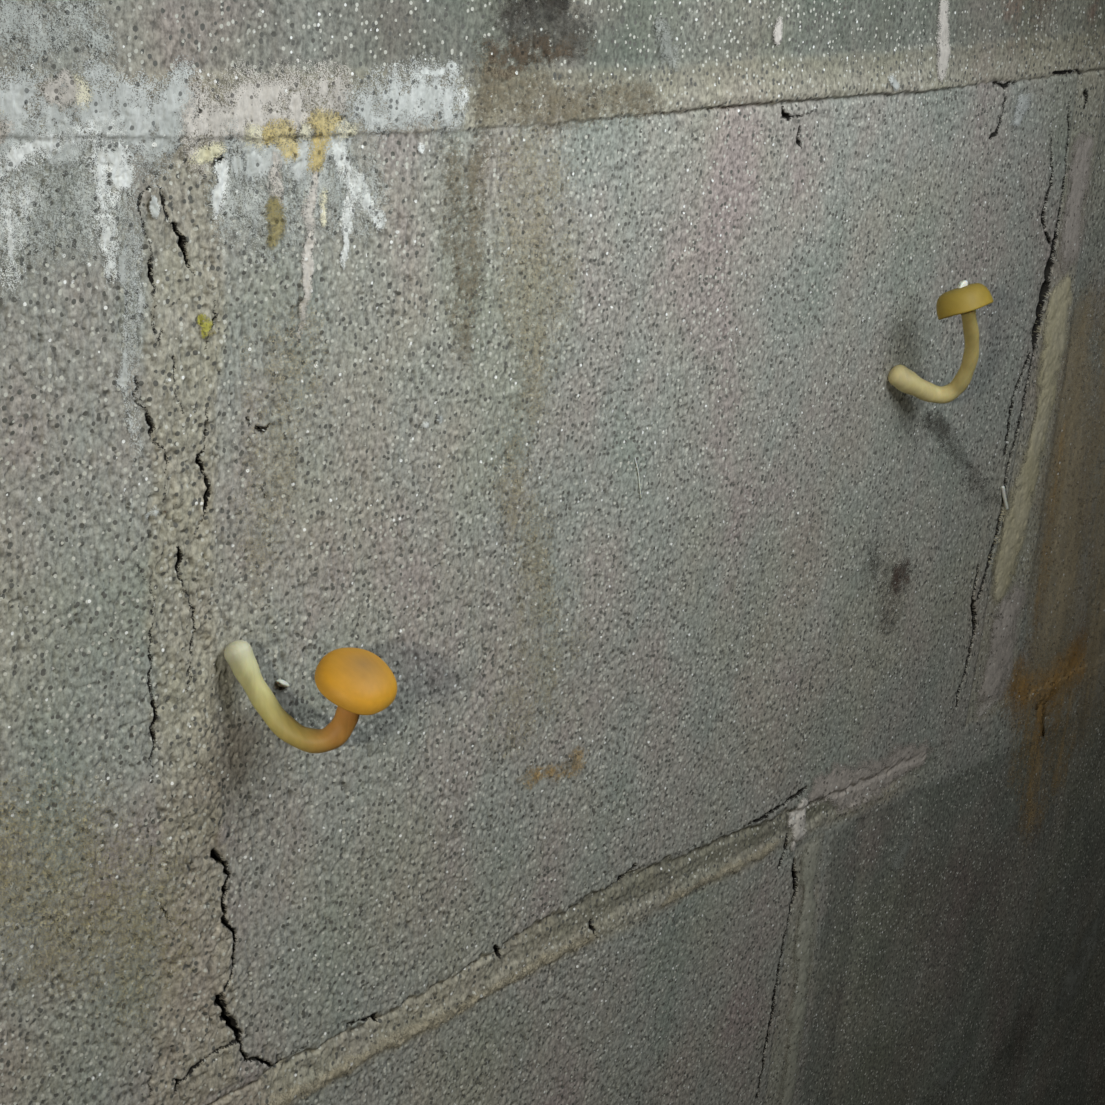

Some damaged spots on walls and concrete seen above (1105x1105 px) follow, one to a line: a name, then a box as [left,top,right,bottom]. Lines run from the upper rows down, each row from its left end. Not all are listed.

crack [136,564,159,783]
crack [132,184,211,692]
leakage [0,0,665,790]
crack [955,68,1088,707]
crack [148,849,304,1096]
crack [755,787,808,1099]